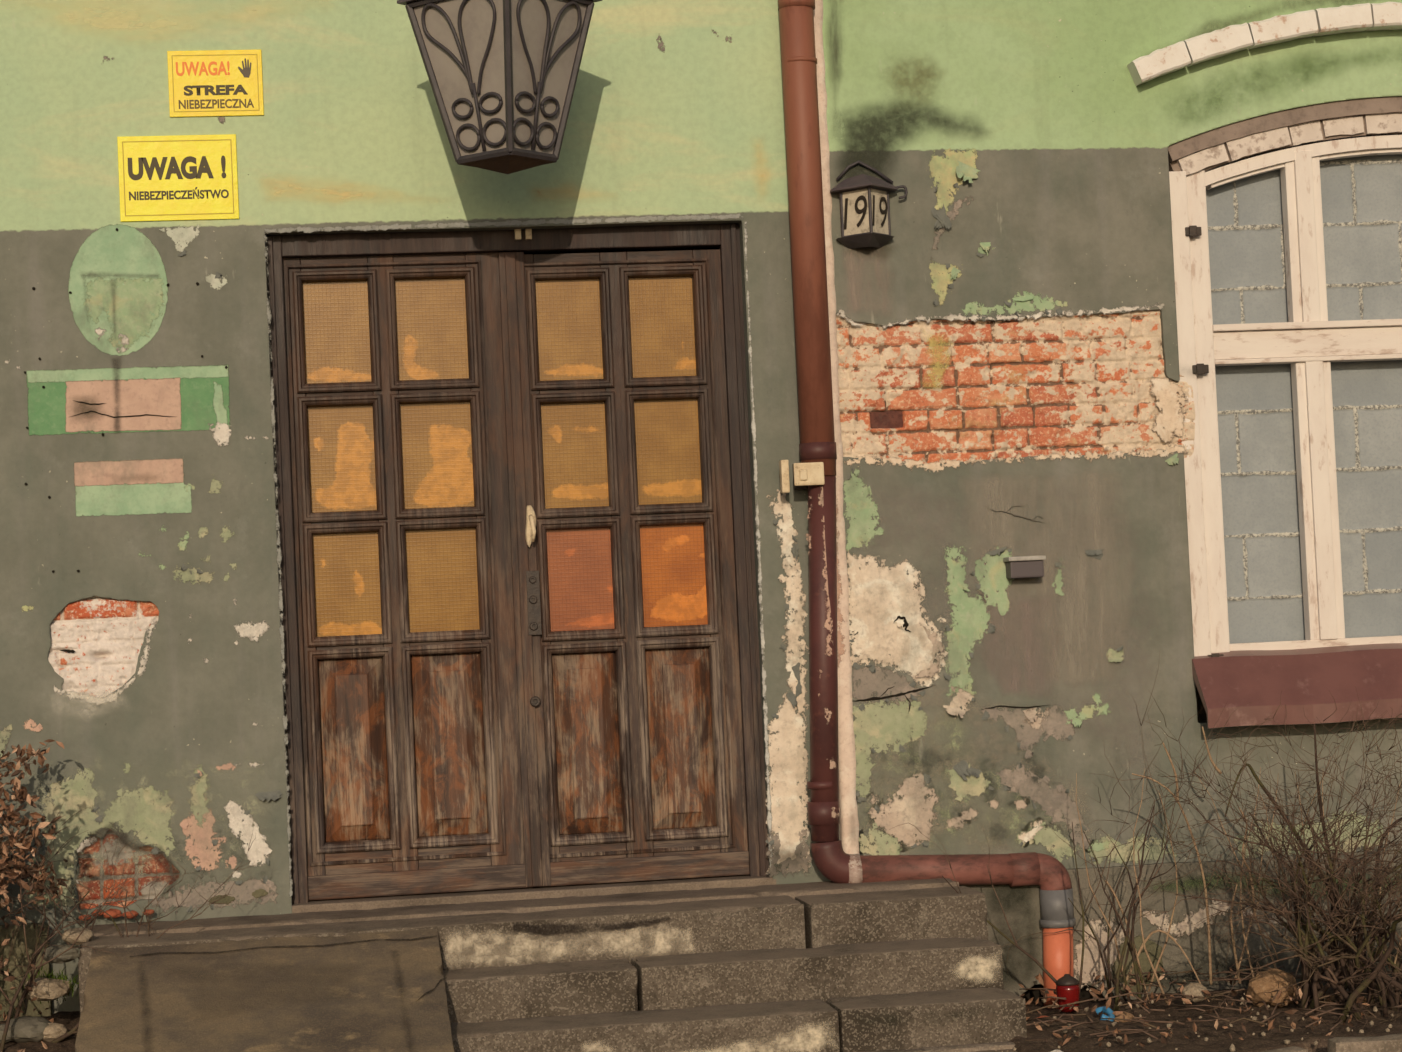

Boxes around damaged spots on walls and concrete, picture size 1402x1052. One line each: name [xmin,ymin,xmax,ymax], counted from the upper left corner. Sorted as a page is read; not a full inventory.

crack [70,400,175,418]
flaking render [764,148,1195,877]
spalling [48,596,159,705]
peeling [0,718,43,758]
peeling [16,762,278,914]
leakage [447,919,692,964]